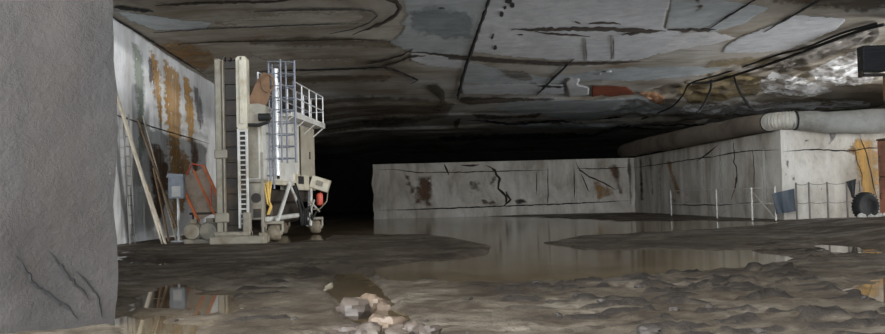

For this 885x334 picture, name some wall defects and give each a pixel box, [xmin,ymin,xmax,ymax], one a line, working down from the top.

crack [765,0,821,32]
crack [113,0,756,100]
spalling [389,0,874,129]
corrosion [592,86,665,104]
crack [117,115,209,144]
corrosion [150,54,194,228]
leakage [406,176,432,206]
crack [469,116,705,137]
crack [385,138,877,210]
corrosion [848,139,879,196]
crack [16,251,103,319]